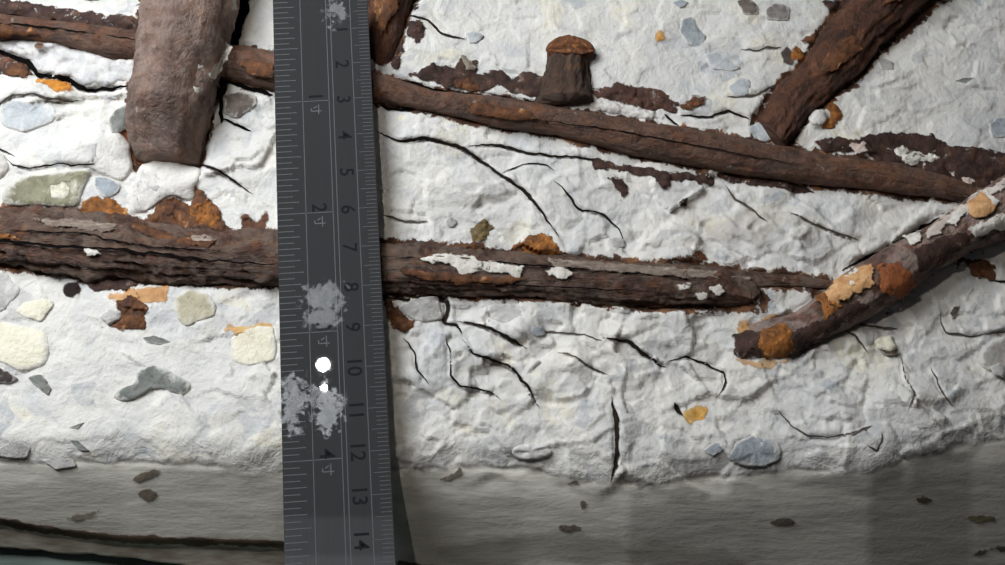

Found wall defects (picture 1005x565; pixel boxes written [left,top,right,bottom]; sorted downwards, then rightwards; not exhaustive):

spalling [0,40,192,220]
rust [390,20,547,123]
crack [376,78,623,238]
spalling [370,0,849,145]
rust [590,82,706,113]
rust [592,158,814,197]
rust [814,98,1005,218]
spalling [0,264,283,501]
crack [383,294,540,409]
crack [545,331,726,481]
spalling [373,102,1005,487]
crack [940,310,1005,338]